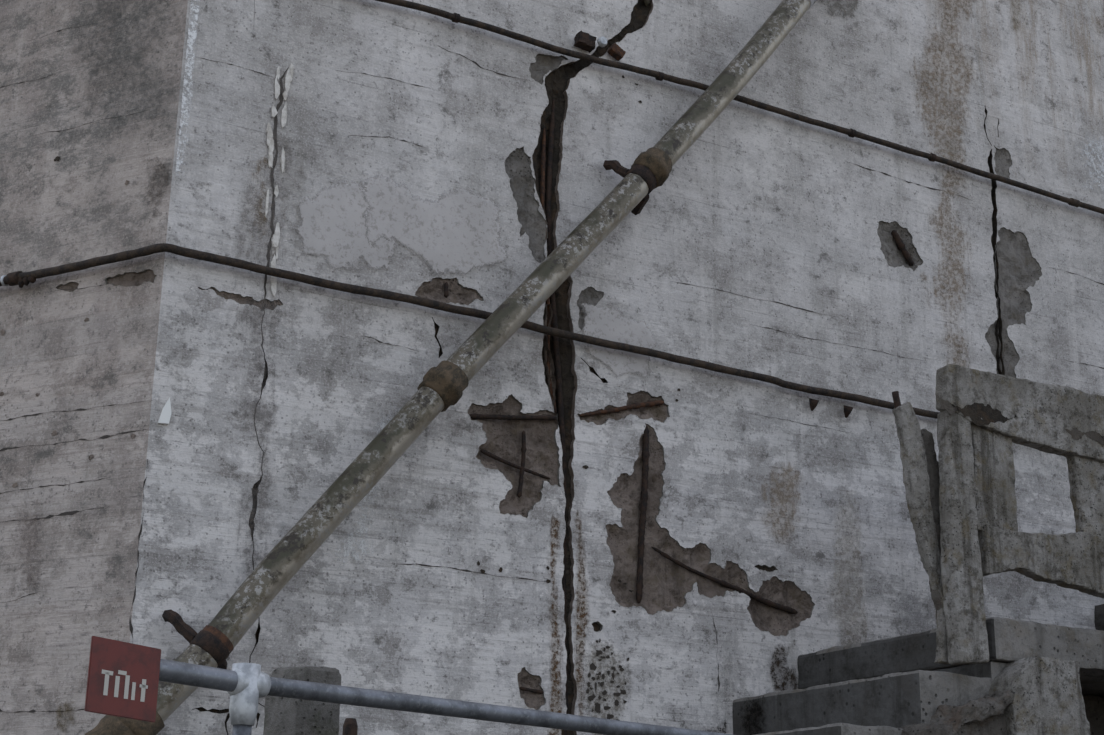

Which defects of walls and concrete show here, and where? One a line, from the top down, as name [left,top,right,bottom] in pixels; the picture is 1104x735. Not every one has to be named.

crack [532,0,653,257]
spalling [415,277,484,305]
spalling [505,146,548,263]
spalling [877,221,923,271]
crack [129,459,148,643]
crack [249,304,268,570]
crack [404,276,608,735]
spalling [468,394,562,518]
spalling [577,389,815,636]
crack [192,707,230,735]
crack [249,623,261,663]
spalling [517,667,546,710]